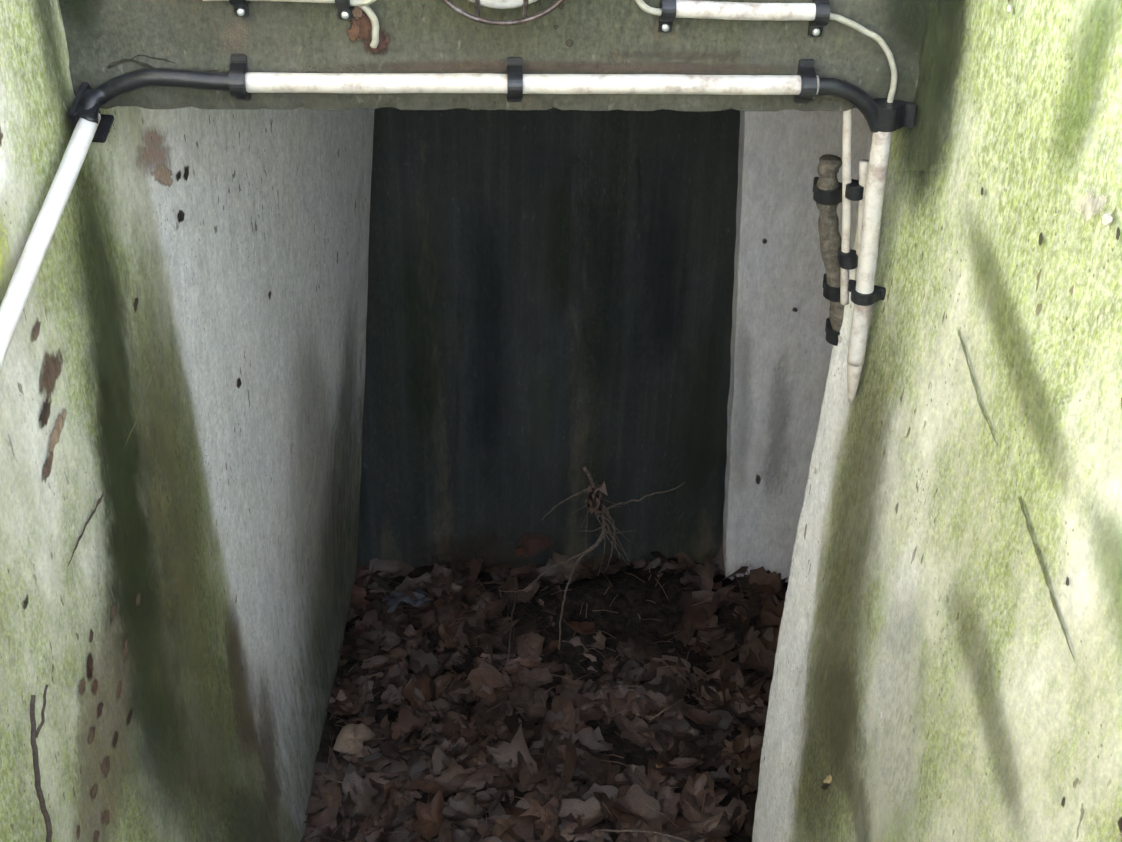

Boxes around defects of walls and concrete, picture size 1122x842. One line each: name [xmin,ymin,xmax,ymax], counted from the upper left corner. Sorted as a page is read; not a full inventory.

corrosion [347,6,507,70]
corrosion [522,63,761,72]
crack [958,329,996,442]
crack [1019,497,1074,659]